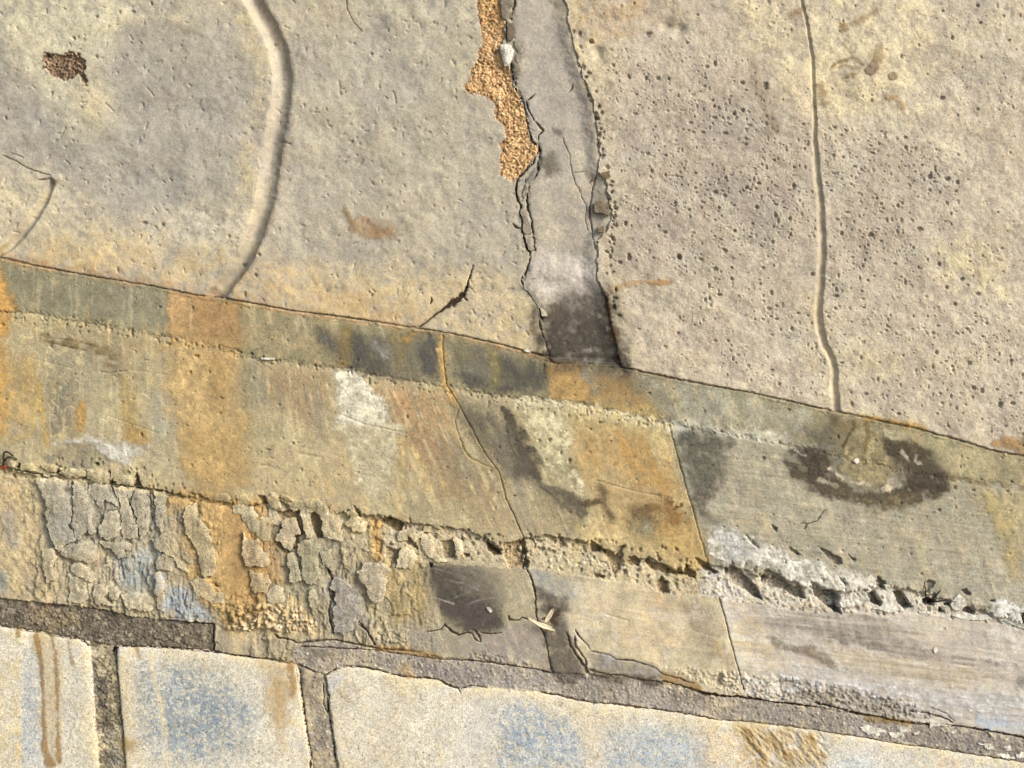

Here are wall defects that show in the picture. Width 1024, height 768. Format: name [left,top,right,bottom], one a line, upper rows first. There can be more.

spalling [463,0,538,251]
crack [505,0,597,285]
peeling [7,459,229,613]
peeling [214,492,470,634]
water stain [317,328,445,499]
spalling [487,538,530,569]
crack [0,256,1024,768]
water stain [454,288,735,526]
spalling [591,541,856,614]
water stain [785,416,949,509]
spalling [864,574,1024,629]
corrosion [34,633,62,768]